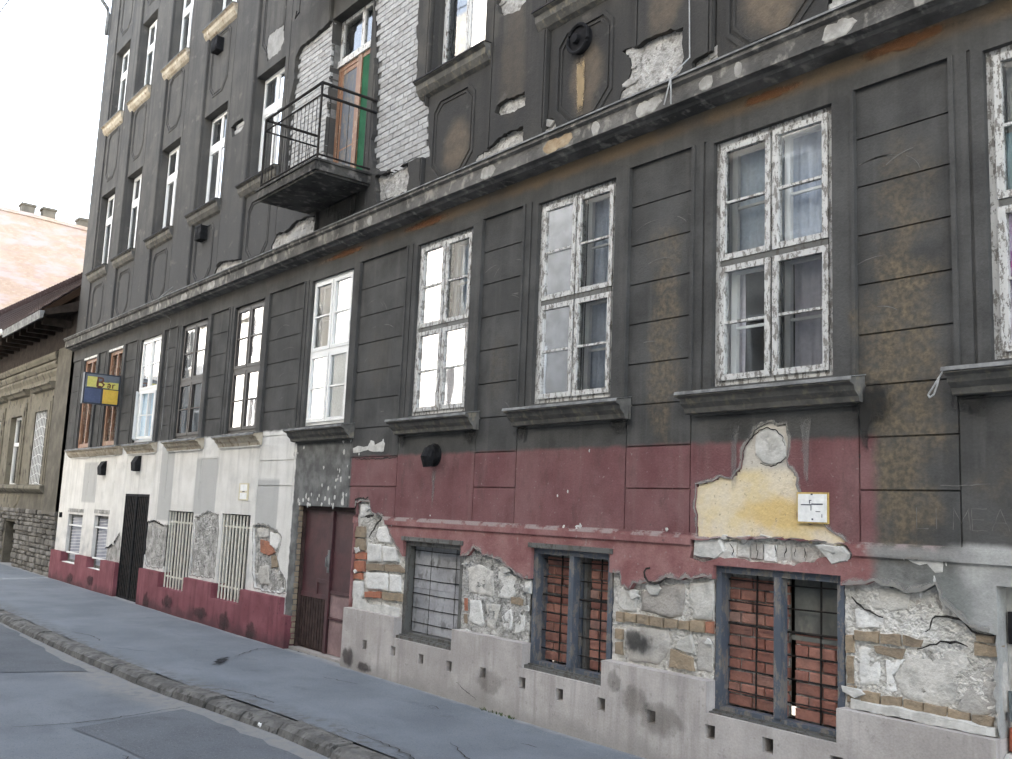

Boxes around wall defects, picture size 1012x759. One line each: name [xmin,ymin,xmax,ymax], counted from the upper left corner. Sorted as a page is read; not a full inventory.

flaking render [288,22,336,170]
flaking render [374,0,430,201]
flaking render [621,31,684,118]
flaking render [144,520,168,569]
flaking render [252,523,286,594]
flaking render [298,439,406,617]
flaking render [460,546,533,643]
flaking render [612,570,716,680]
peeling [693,420,852,566]
crack [852,597,883,618]
flaking render [841,559,1012,752]
crack [917,615,994,650]